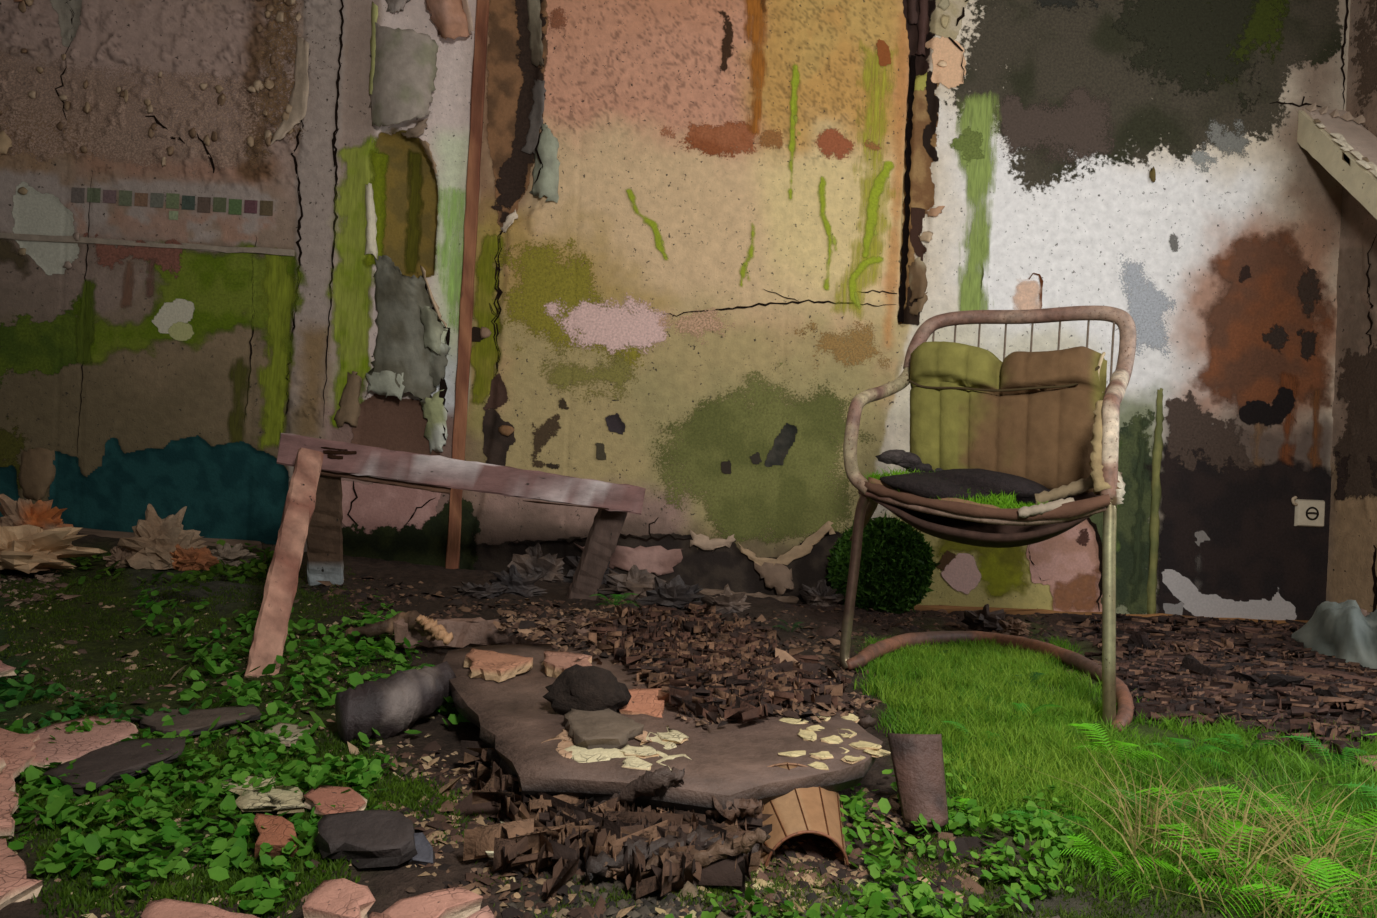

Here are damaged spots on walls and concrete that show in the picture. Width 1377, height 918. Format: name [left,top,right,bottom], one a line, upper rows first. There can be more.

spalling [385,0,560,233]
crack [668,0,936,322]
leakage [944,0,1377,196]
leakage [228,254,296,448]
peeling [351,130,451,455]
corrosion [1198,231,1334,469]
leakage [1262,267,1322,361]
peeling [0,435,289,544]
spalling [473,537,587,575]
spalling [609,521,843,602]
leakage [650,362,876,544]
leakage [1089,345,1377,621]